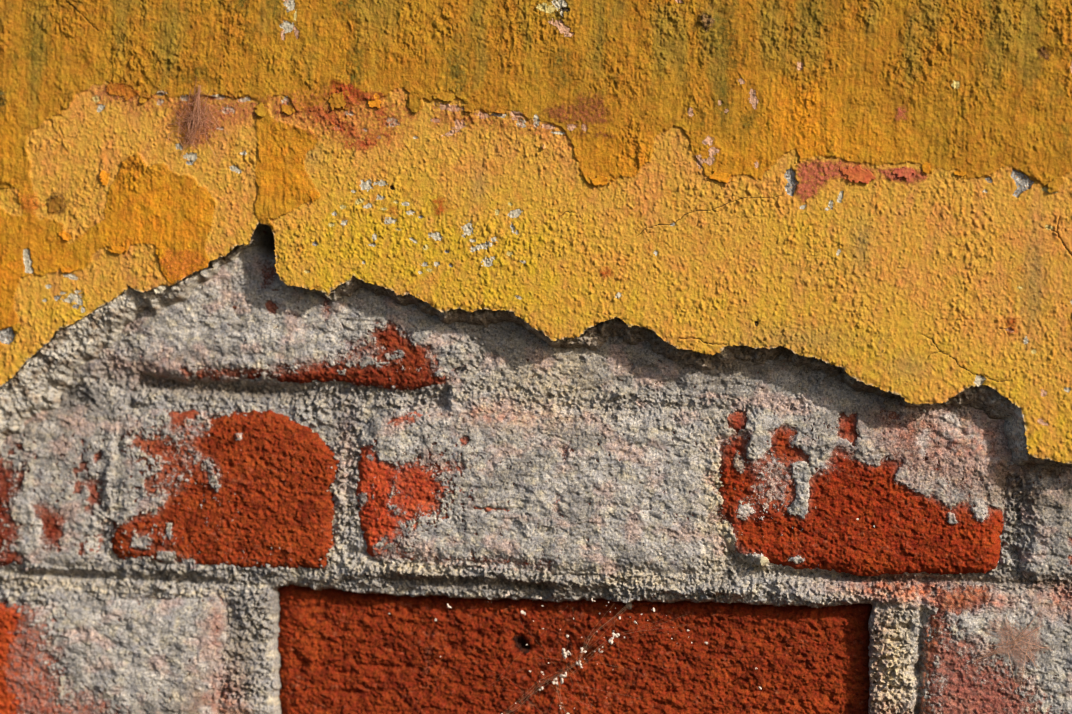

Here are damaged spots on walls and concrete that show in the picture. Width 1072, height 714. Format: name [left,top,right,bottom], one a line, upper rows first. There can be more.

peeling [0,78,1072,468]
spalling [513,635,530,654]